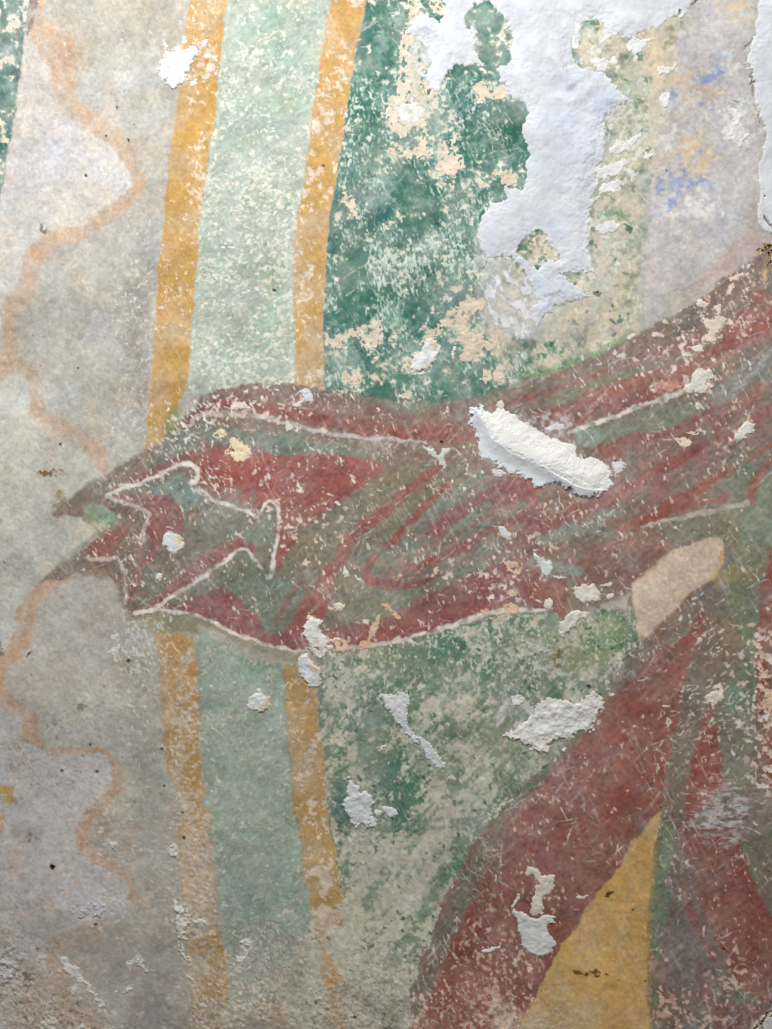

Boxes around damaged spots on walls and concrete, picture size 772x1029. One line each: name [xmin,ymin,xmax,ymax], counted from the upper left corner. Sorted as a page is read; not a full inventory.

peeling [747,0,772,234]
peeling [384,0,701,326]
spalling [690,299,727,352]
spalling [683,368,715,394]
spalling [297,602,401,688]
peeling [511,694,525,706]
peeling [368,806,398,827]
spalling [511,866,555,916]
crack [753,1010,772,1029]